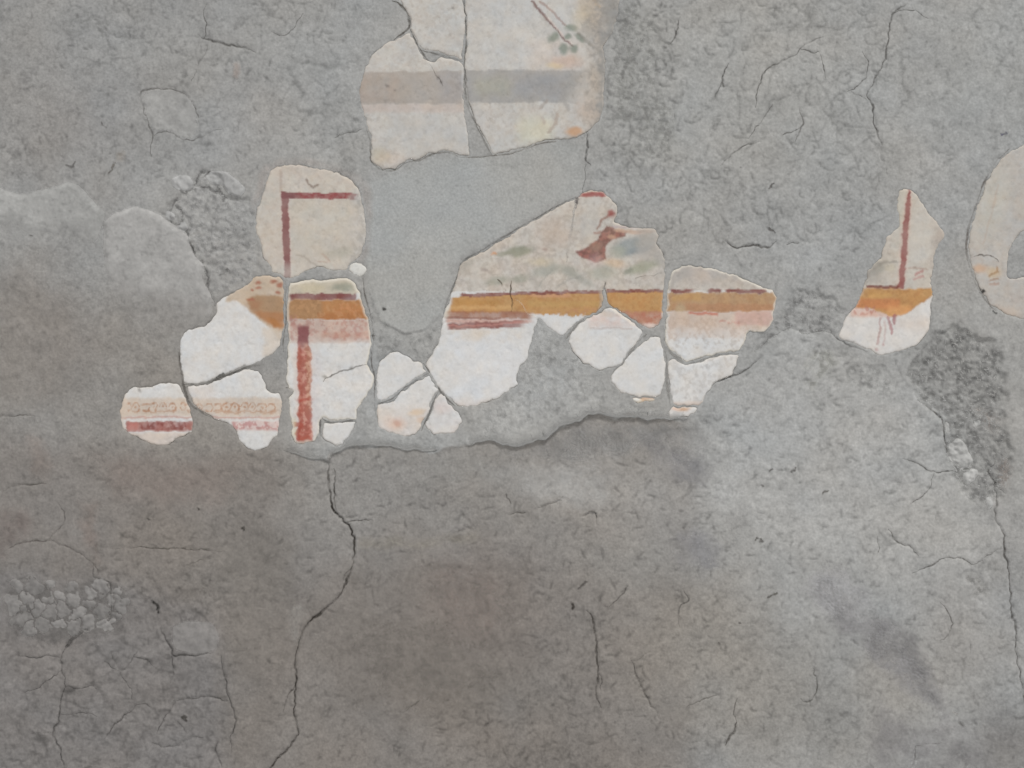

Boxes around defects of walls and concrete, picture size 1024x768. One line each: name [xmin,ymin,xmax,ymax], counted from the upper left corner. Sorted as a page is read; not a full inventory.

spalling [166,171,256,290]
spalling [910,332,1009,509]
crack [293,486,362,713]
crack [26,637,230,759]